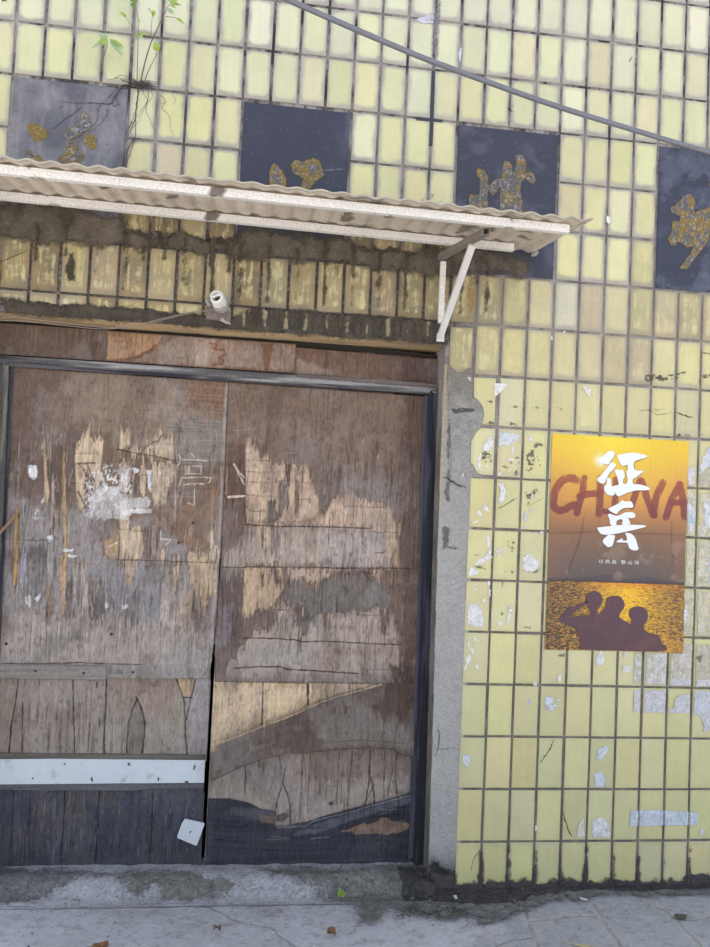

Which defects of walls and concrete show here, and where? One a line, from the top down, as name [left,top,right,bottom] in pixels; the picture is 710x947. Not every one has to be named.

leakage [0,202,531,345]
spalling [447,365,520,477]
leakage [428,844,710,889]